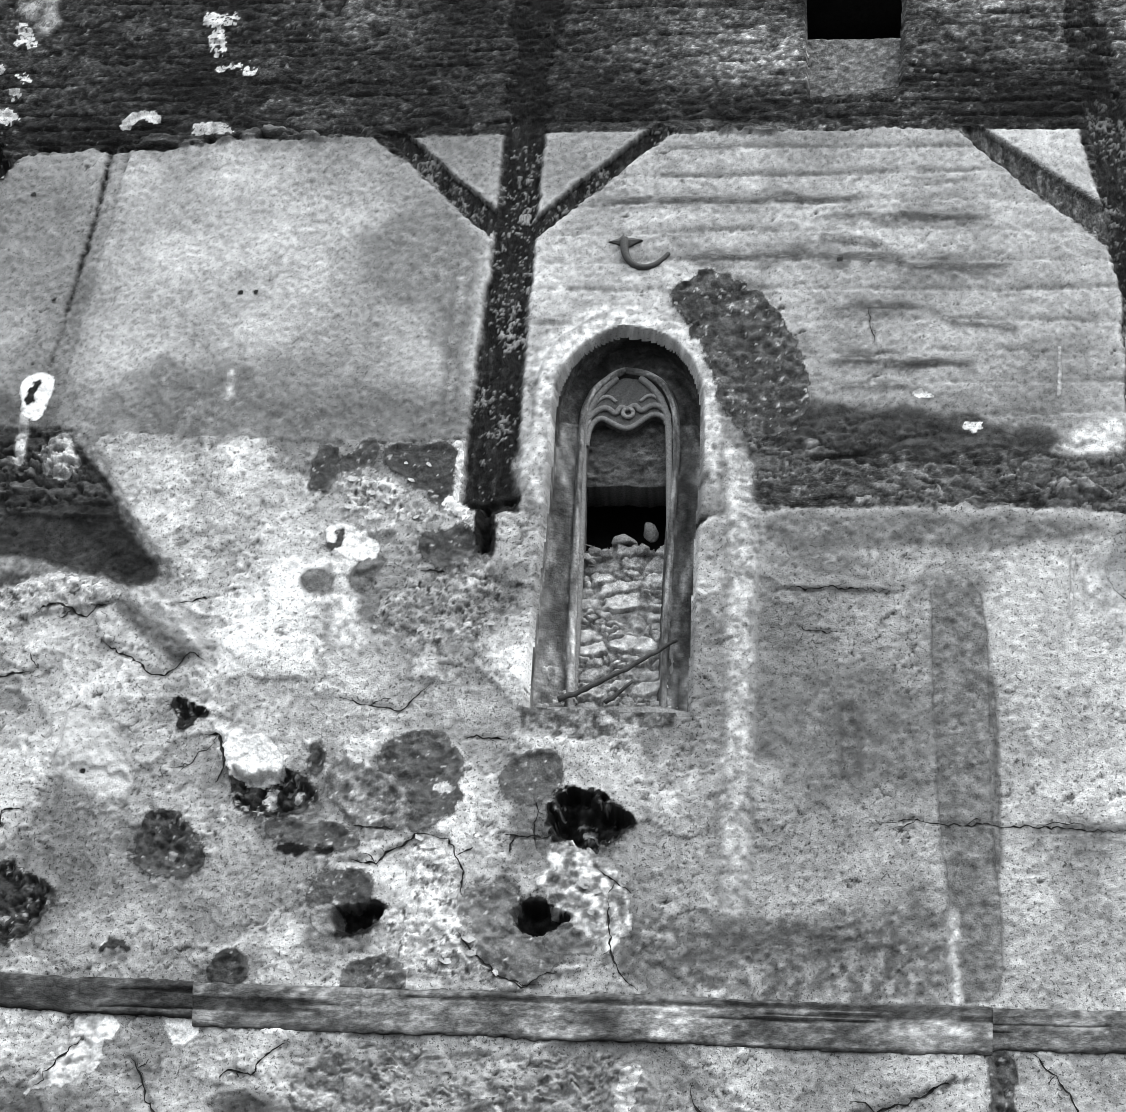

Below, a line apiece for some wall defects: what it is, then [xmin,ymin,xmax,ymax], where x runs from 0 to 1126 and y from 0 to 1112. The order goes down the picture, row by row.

spalling [670,268,811,445]
peeling [307,438,523,649]
crack [33,602,112,618]
crack [109,646,205,676]
spalling [170,695,209,731]
spalling [128,808,205,879]
peeling [217,729,638,993]
crack [871,818,1126,833]
spalling [0,859,58,947]
crack [598,869,638,991]
crack [851,1080,958,1112]
crack [1029,1052,1079,1112]